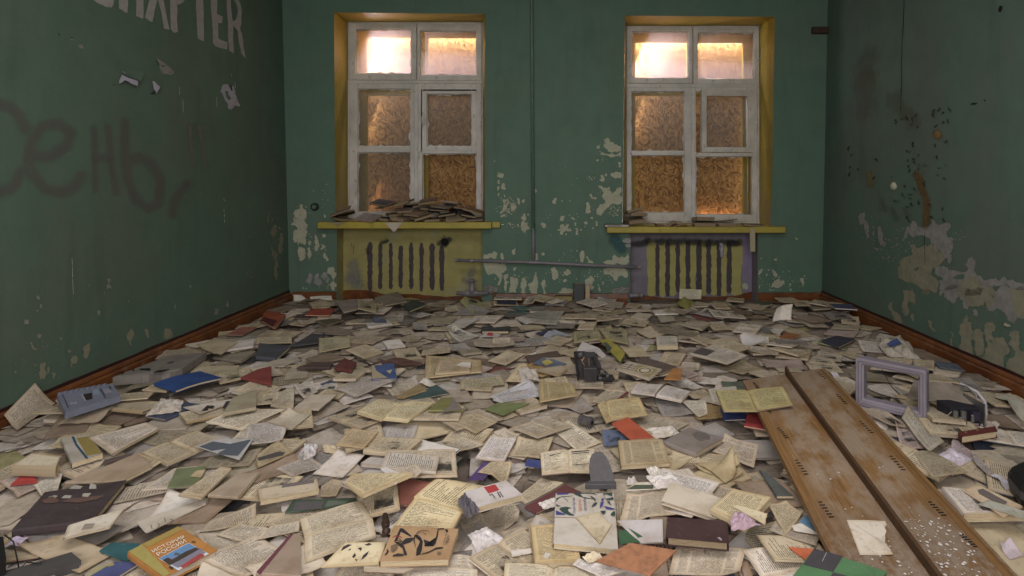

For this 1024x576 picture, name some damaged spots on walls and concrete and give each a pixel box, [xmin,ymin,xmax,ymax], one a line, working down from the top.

peeling [221,84,240,109]
peeling [494,138,623,236]
peeling [267,204,337,290]
peeling [483,238,631,295]
peeling [842,140,1024,376]